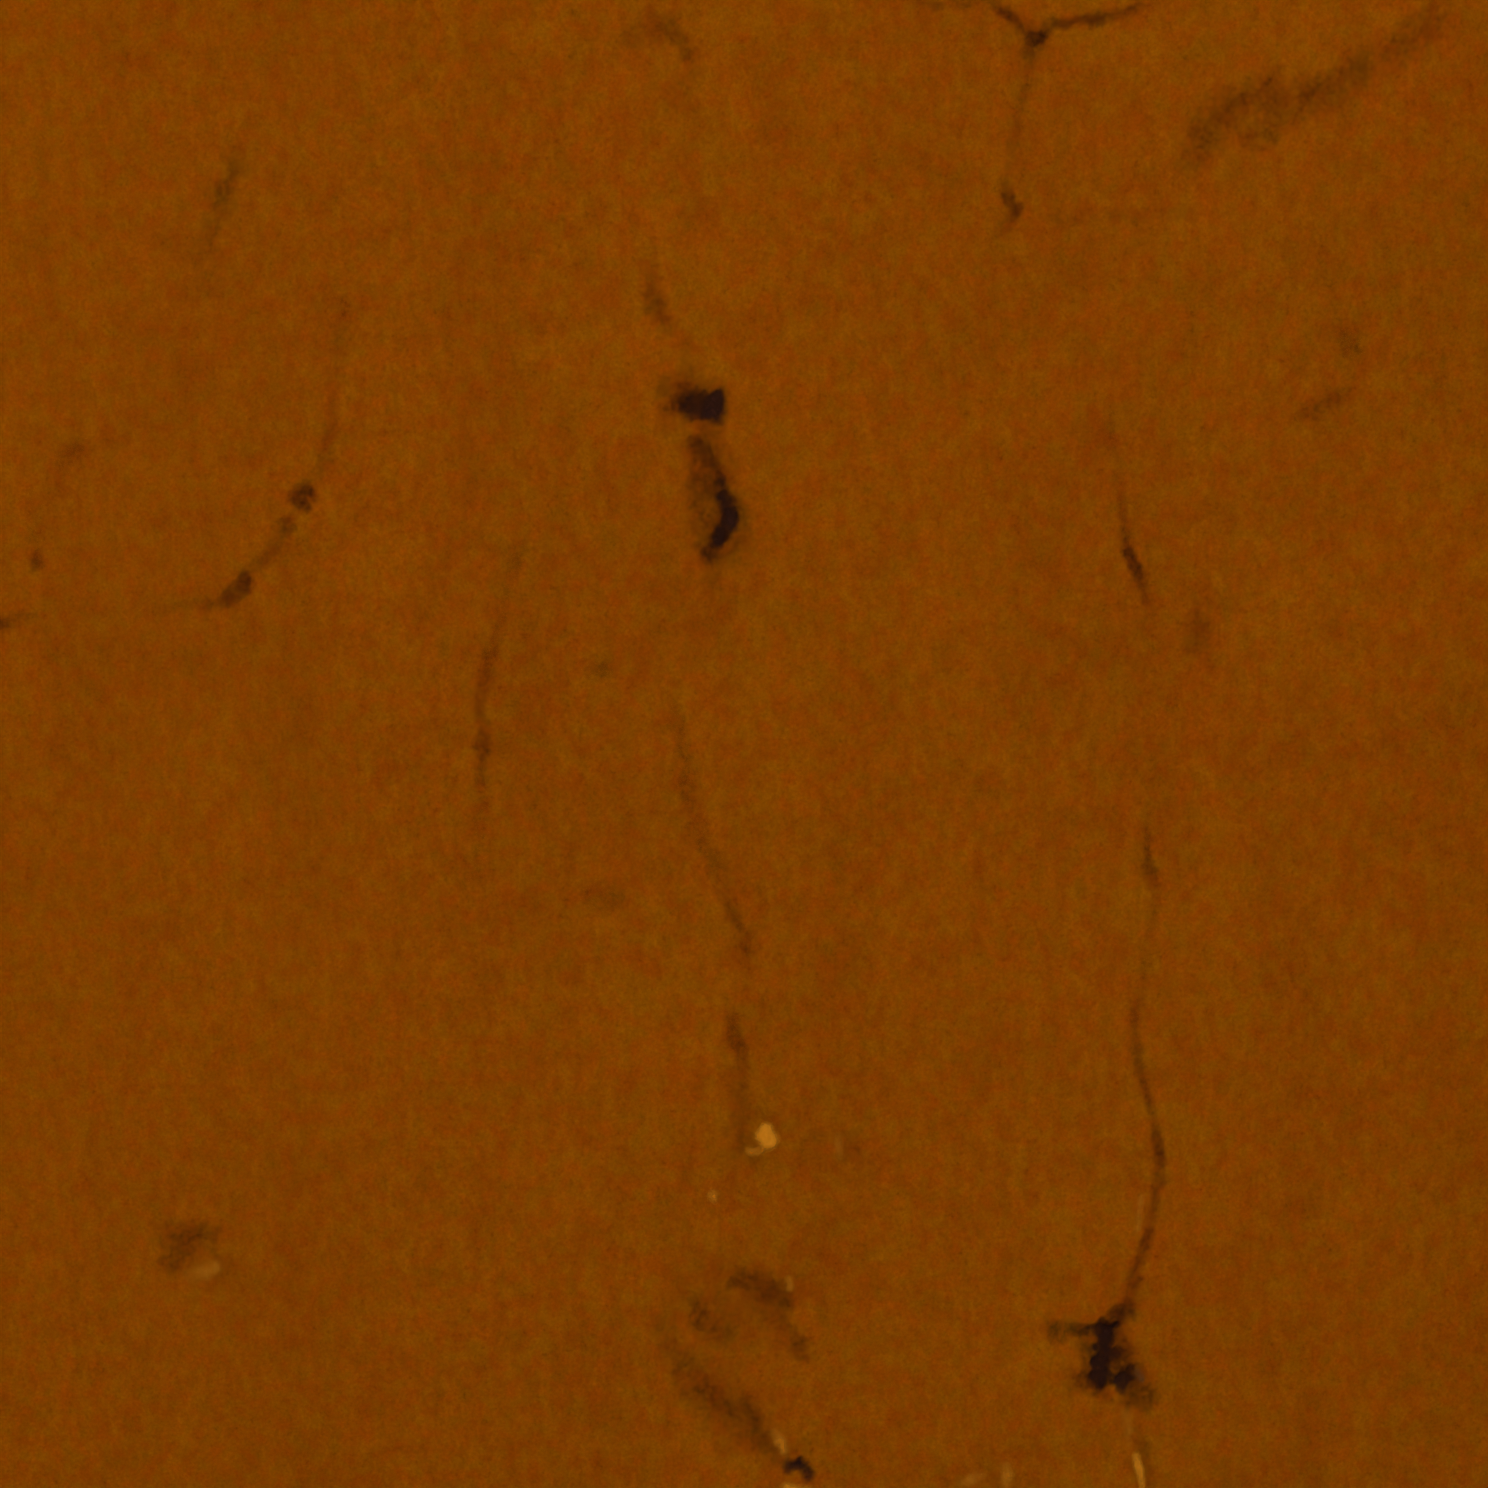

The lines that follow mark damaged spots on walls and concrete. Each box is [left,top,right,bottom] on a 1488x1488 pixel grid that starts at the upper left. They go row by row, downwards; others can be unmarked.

crack [1000,9,1103,41]
crack [292,486,313,509]
crack [1124,539,1141,578]